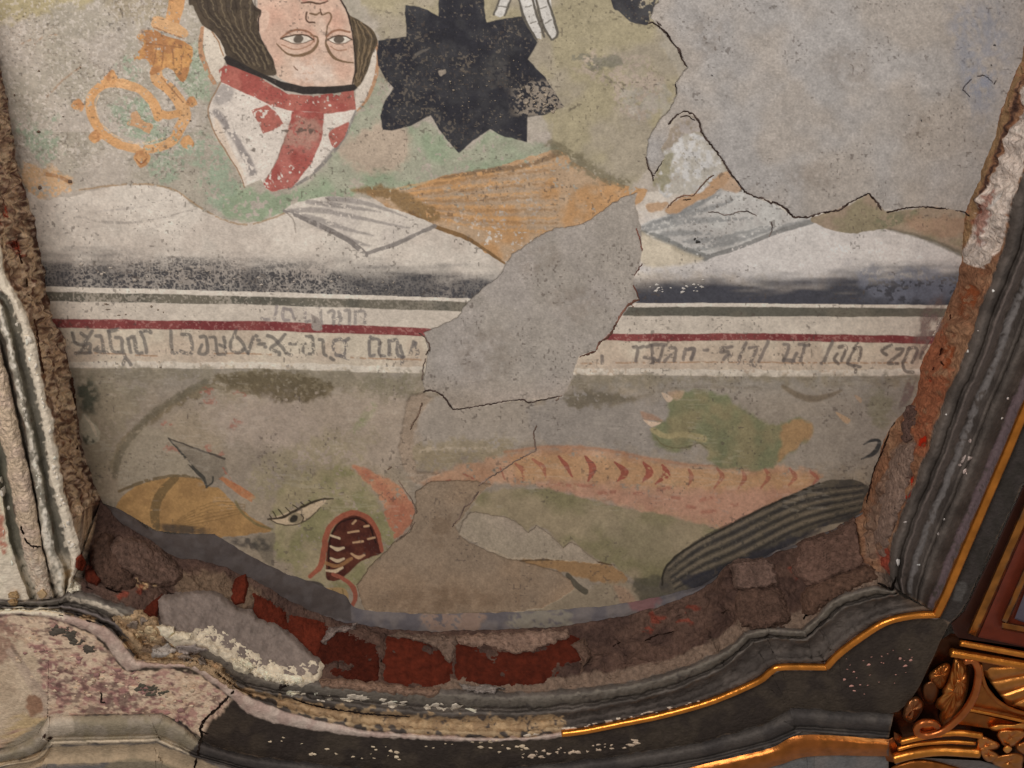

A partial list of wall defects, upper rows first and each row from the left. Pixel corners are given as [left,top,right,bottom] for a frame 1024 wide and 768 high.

crack [645,157,664,181]
crack [648,22,970,237]
crack [410,333,562,527]
flaking render [14,610,407,722]
crack [193,686,235,768]
peeling [424,703,477,713]